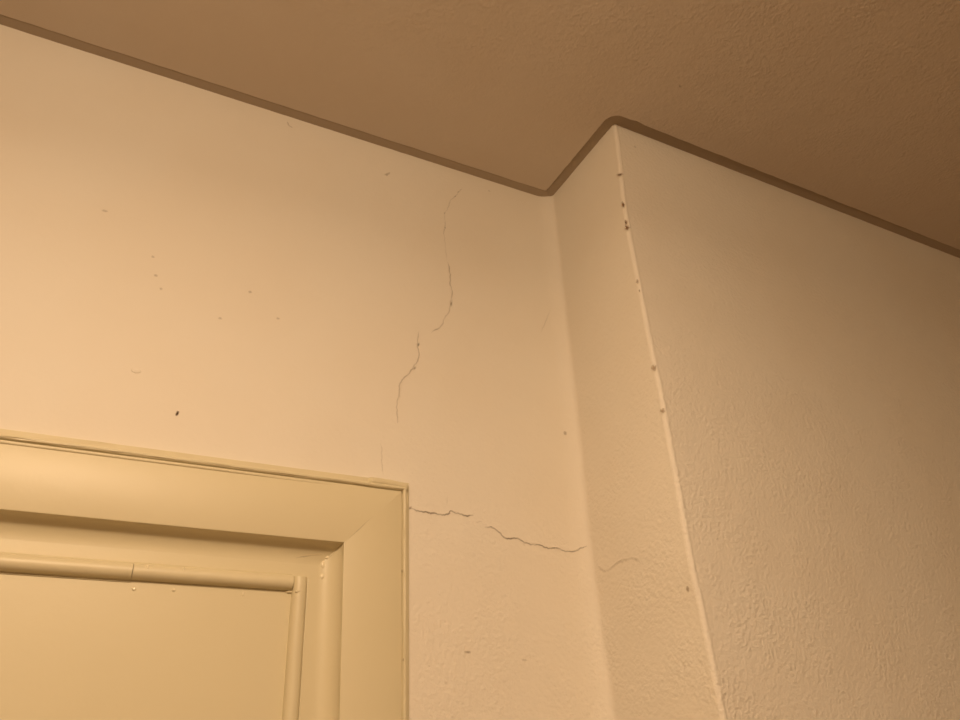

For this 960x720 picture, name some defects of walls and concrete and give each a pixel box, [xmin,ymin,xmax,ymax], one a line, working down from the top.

crack [409,507,586,552]